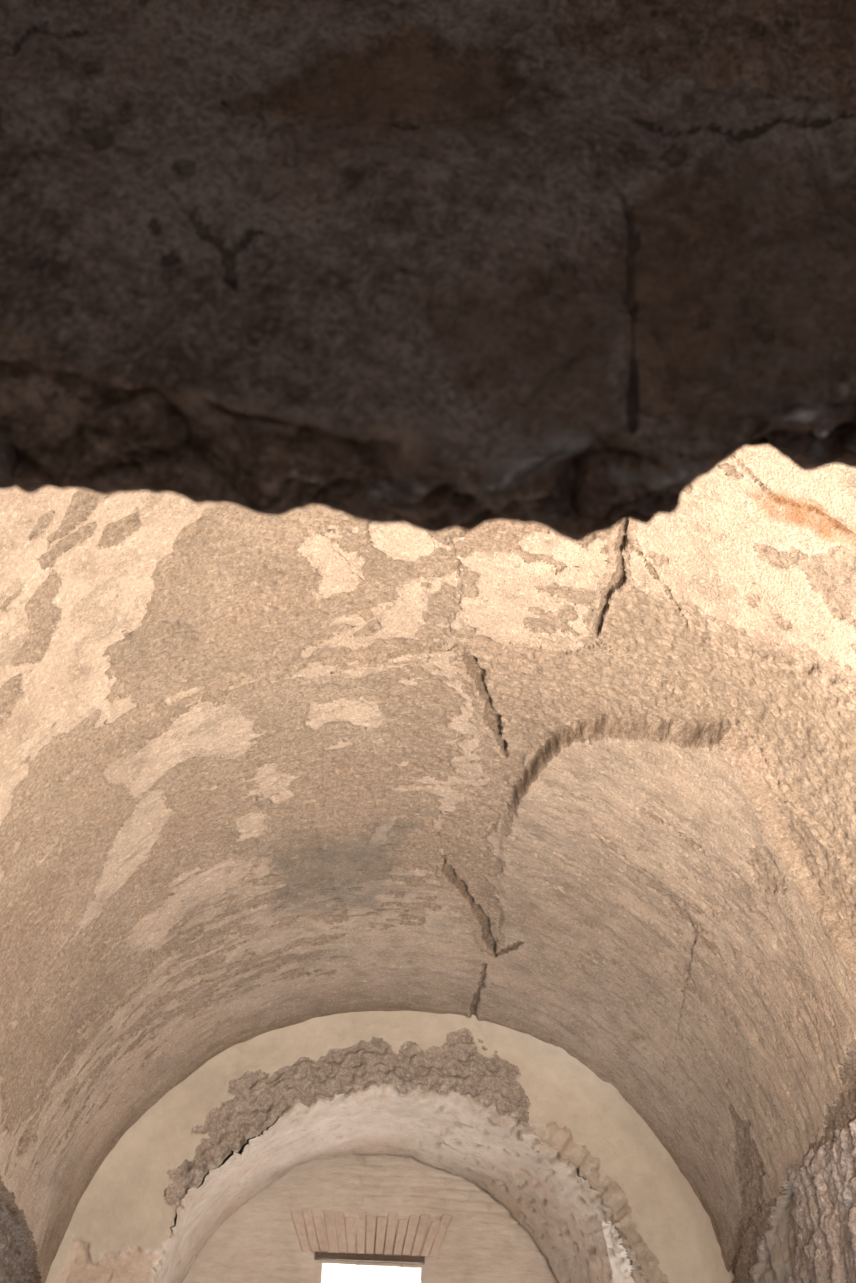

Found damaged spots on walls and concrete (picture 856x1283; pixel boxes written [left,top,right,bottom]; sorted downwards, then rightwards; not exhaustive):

crack [622,197,641,434]
crack [734,455,854,534]
flaking render [0,350,856,1175]
crack [59,518,856,880]
crack [433,853,524,1019]
crack [0,1176,43,1283]
spalling [163,1028,669,1283]
flaking render [728,1104,791,1283]